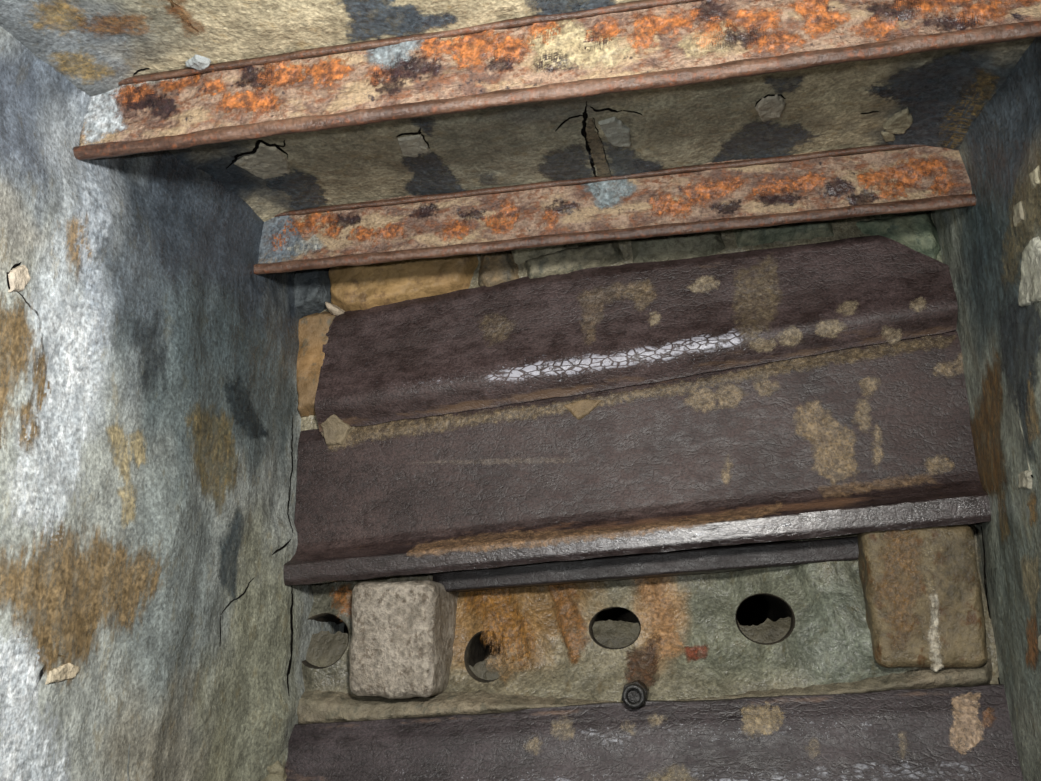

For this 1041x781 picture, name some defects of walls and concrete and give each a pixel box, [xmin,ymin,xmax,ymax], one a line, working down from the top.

water stain [403,12,455,27]
corrosion [414,21,562,71]
corrosion [585,0,1039,54]
corrosion [110,56,354,113]
crack [226,140,290,179]
crack [555,102,642,177]
corrosion [857,69,997,199]
corrosion [649,171,826,218]
corrosion [271,211,404,251]
peeling [1003,156,1041,307]
corrosion [464,588,535,681]
corrosion [625,578,708,686]